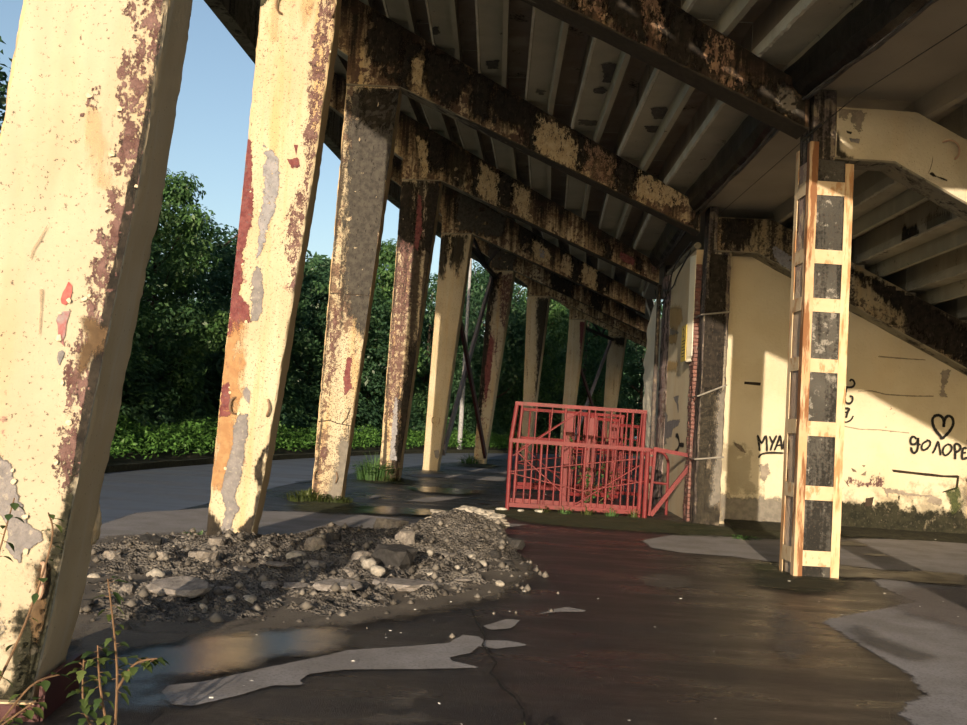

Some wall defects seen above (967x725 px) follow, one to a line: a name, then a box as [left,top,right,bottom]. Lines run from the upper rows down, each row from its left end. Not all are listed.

peeling [227,0,336,338]
peeling [50,0,165,500]
spalling [0,457,43,563]
spalling [219,382,250,534]
leakage [841,479,967,534]